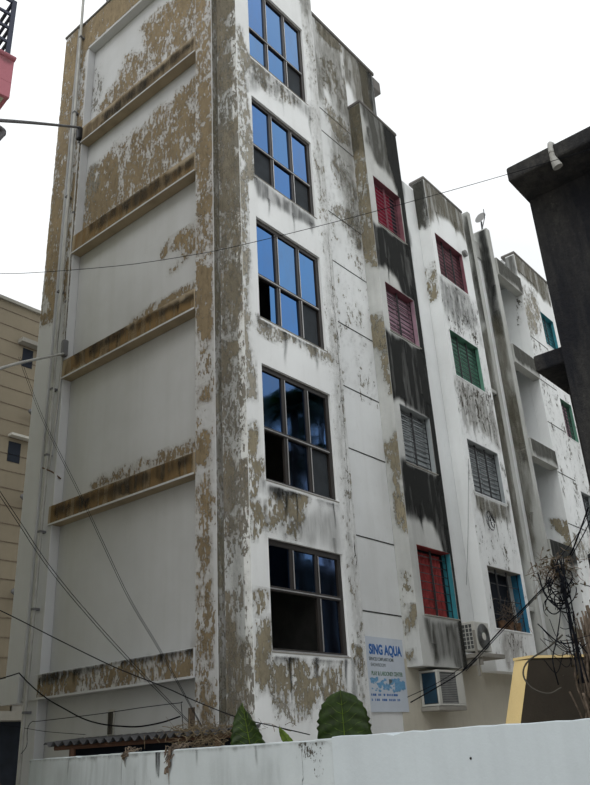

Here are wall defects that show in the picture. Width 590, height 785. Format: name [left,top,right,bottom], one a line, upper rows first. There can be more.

peeling [36,0,392,728]
water stain [270,486,298,515]
peeling [384,431,408,533]
water stain [316,25,558,668]